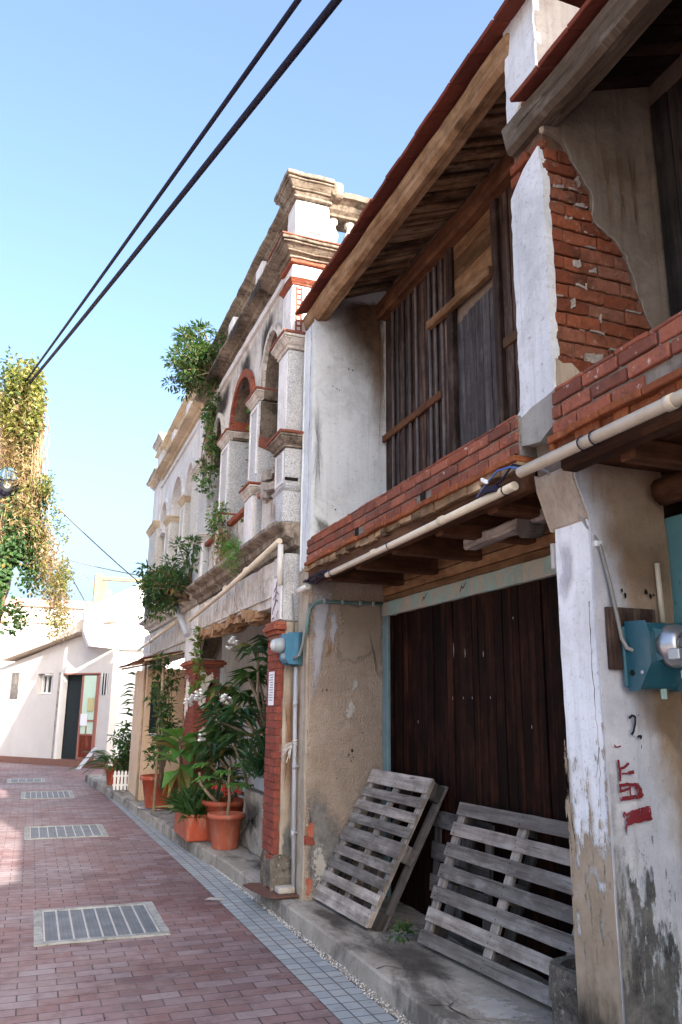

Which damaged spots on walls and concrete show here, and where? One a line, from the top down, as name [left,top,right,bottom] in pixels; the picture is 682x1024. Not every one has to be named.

spalling [544,140,652,372]
spalling [304,821,315,845]
peeling [564,739,682,1024]
damp [614,836,682,1024]